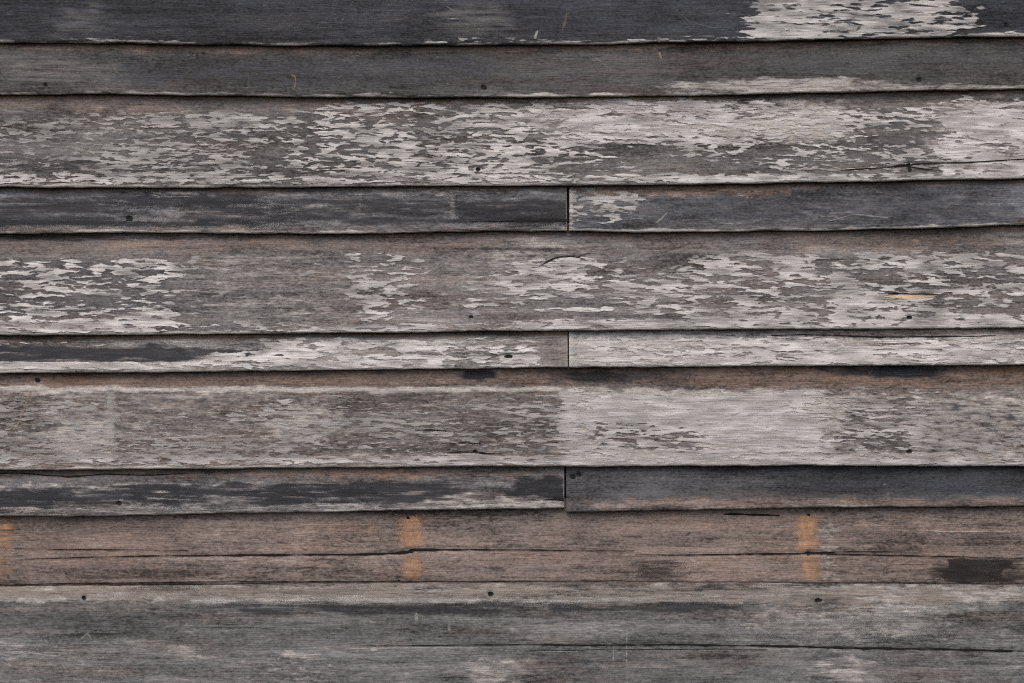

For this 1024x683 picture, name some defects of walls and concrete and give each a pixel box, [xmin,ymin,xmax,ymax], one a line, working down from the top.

peeling [627,0,1019,42]
peeling [0,76,1024,224]
crack [839,158,1024,171]
peeling [0,251,1024,370]
peeling [0,388,1024,468]
crack [14,548,1024,584]